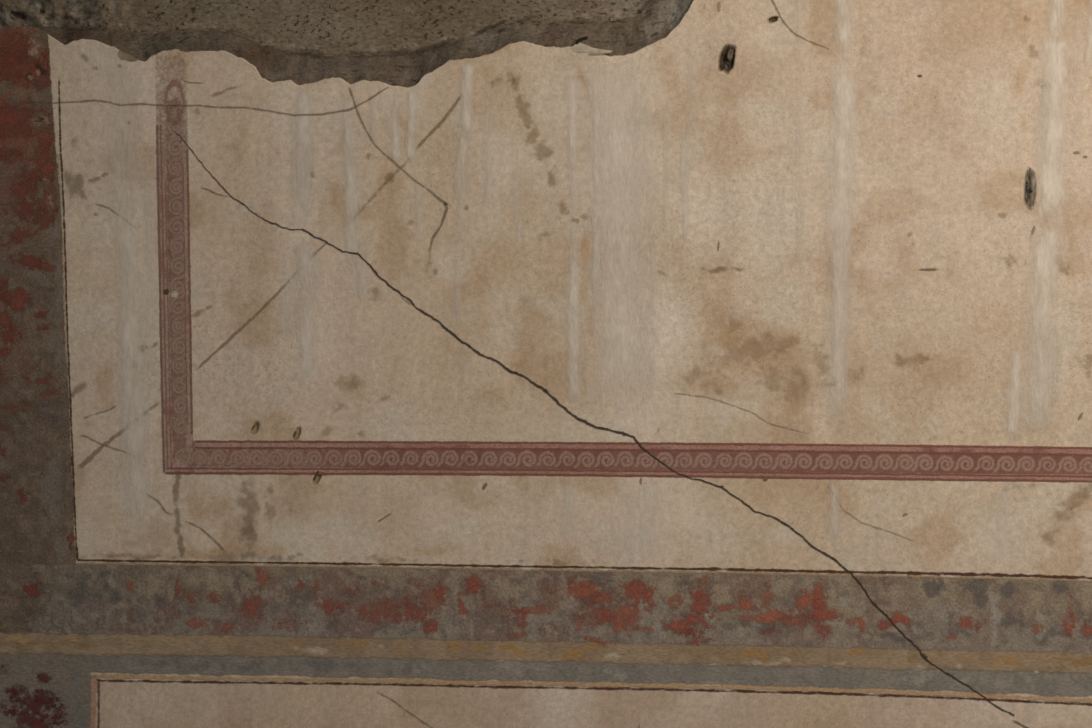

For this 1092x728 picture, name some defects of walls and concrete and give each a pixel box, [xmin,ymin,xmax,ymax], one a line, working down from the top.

crack [147,494,223,549]
spalling [0,0,693,271]
water stain [455,64,474,215]
water stain [568,252,580,397]
crack [175,132,1028,728]
water stain [591,75,646,395]
water stain [829,65,855,401]
water stain [1008,230,1060,432]
water stain [1037,0,1067,217]